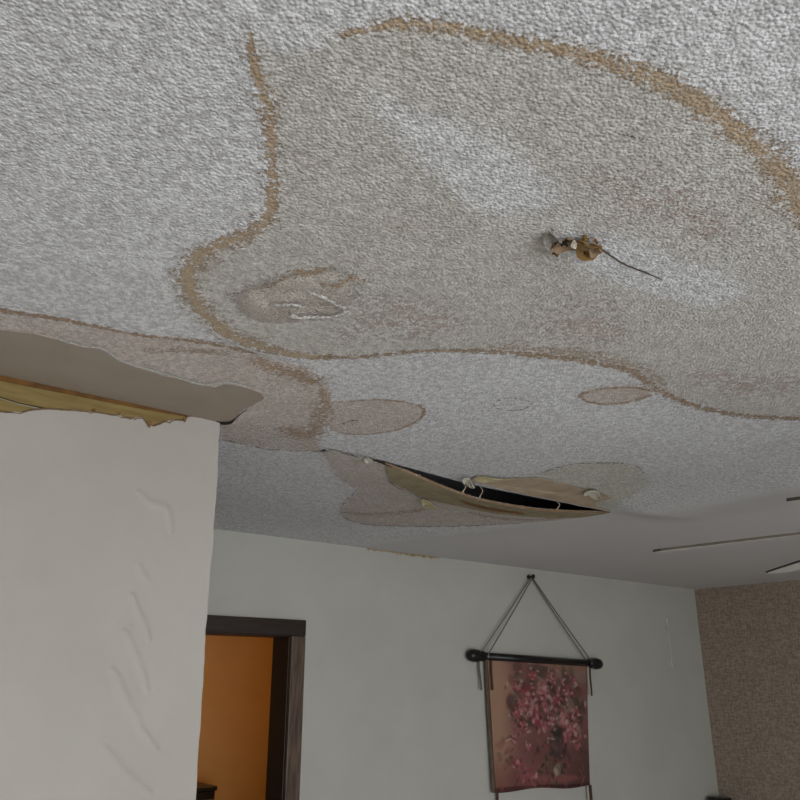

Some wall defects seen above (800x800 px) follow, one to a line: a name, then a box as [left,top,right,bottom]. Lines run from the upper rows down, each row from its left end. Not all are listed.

water stain [0,6,800,527]
spalling [543,232,662,280]